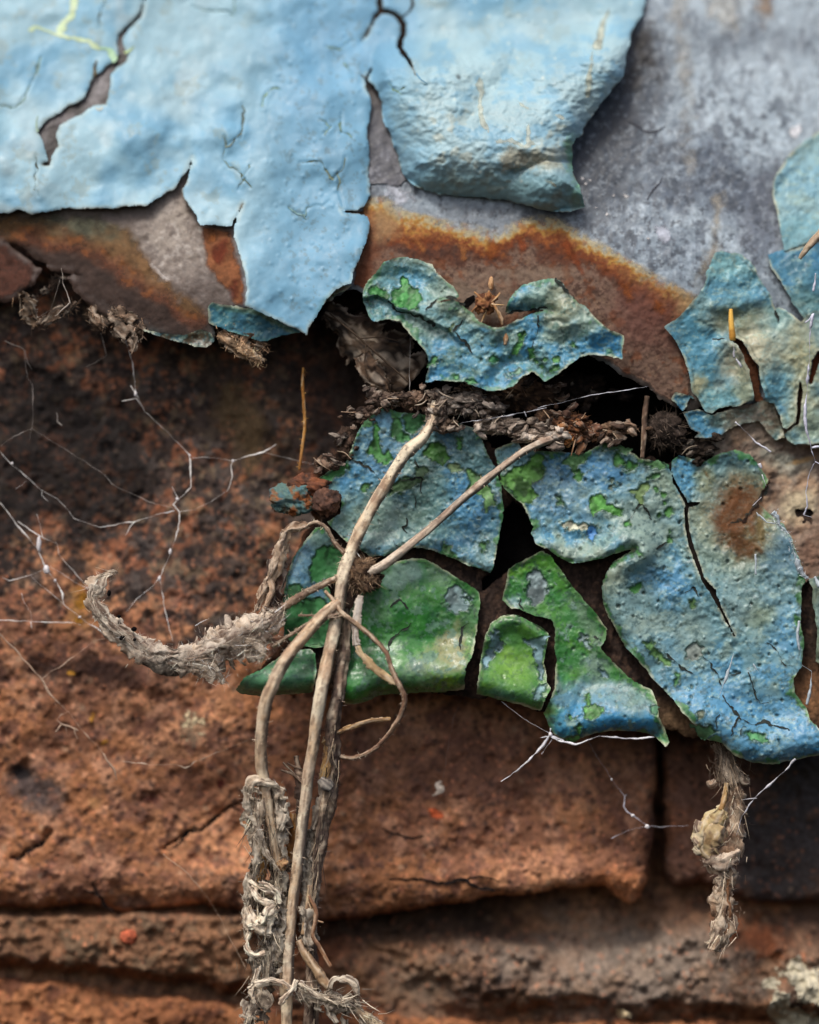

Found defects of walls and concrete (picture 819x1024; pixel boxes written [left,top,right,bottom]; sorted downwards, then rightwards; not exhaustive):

crack [4,0,145,191]
rust [0,215,207,335]
rust [203,227,244,304]
peeling [0,0,645,348]
crack [303,0,427,215]
rust [354,198,694,404]
peeling [236,132,819,764]
rust [716,480,770,555]